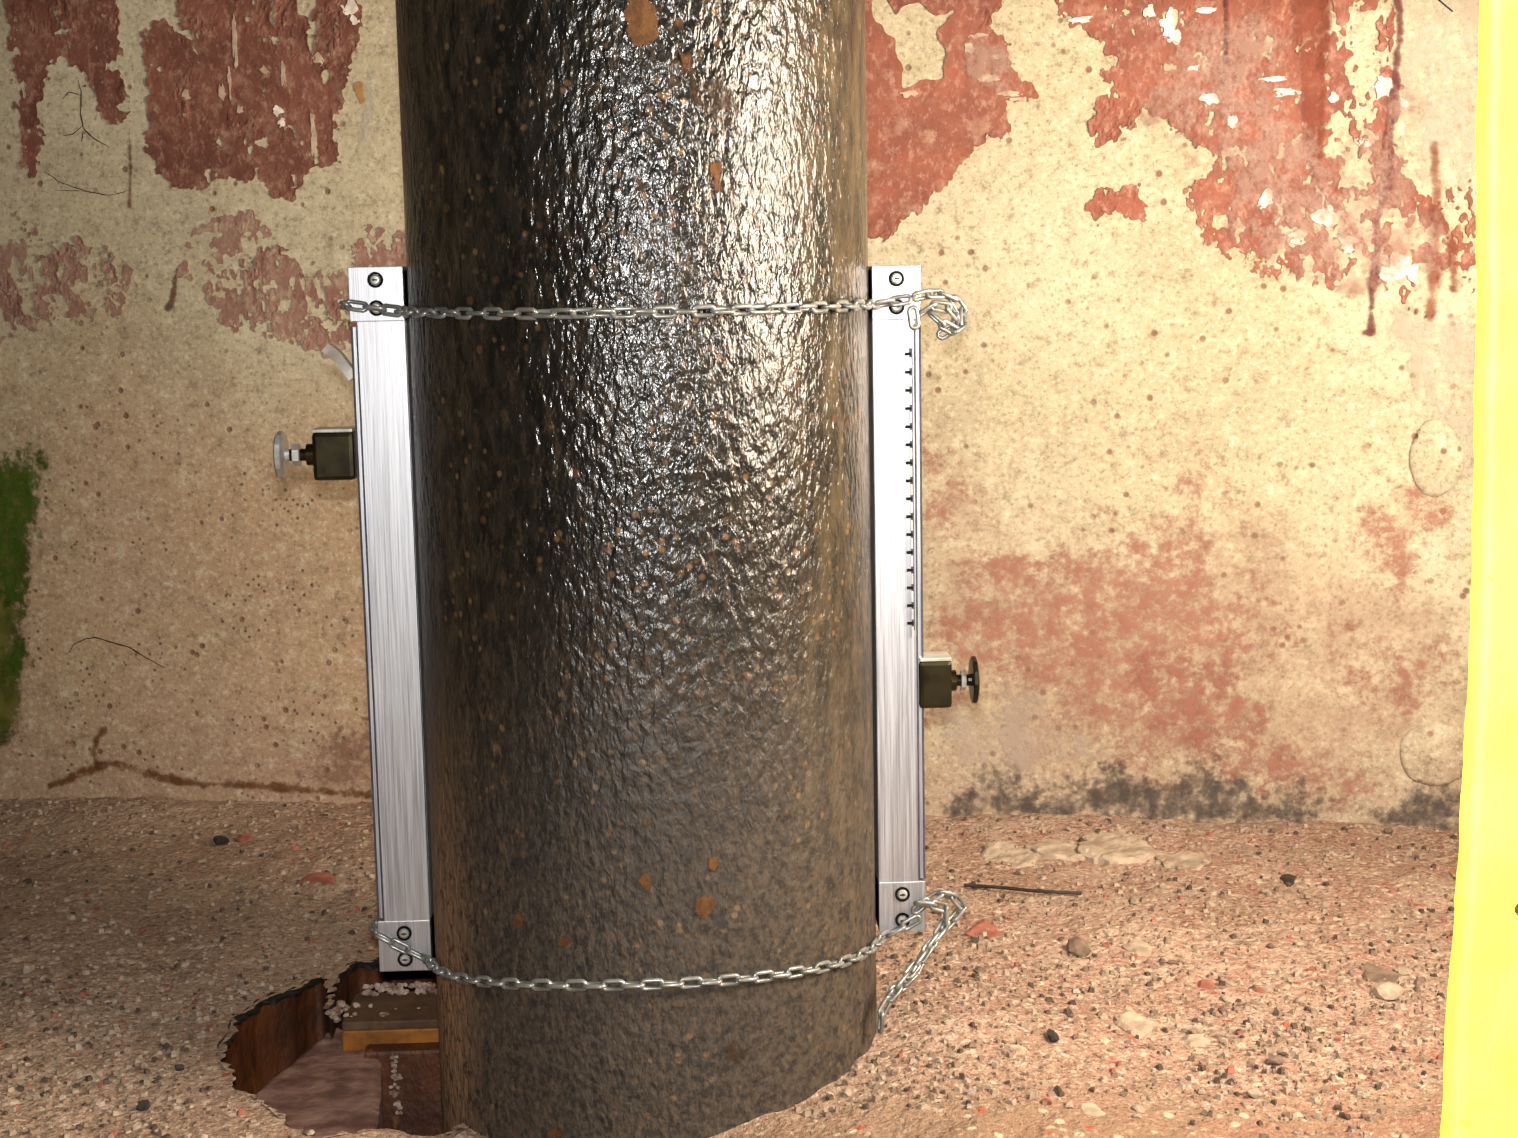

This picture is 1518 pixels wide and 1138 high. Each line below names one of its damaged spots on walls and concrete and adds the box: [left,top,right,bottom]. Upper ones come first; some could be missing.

corrosion [624,0,659,46]
peeling [5,0,363,202]
peeling [865,0,1039,242]
peeling [1055,0,1476,318]
peeling [174,209,407,359]
damp [924,520,1365,823]
damp [1346,640,1443,712]
damp [1374,784,1461,830]
corrosion [695,895,715,918]